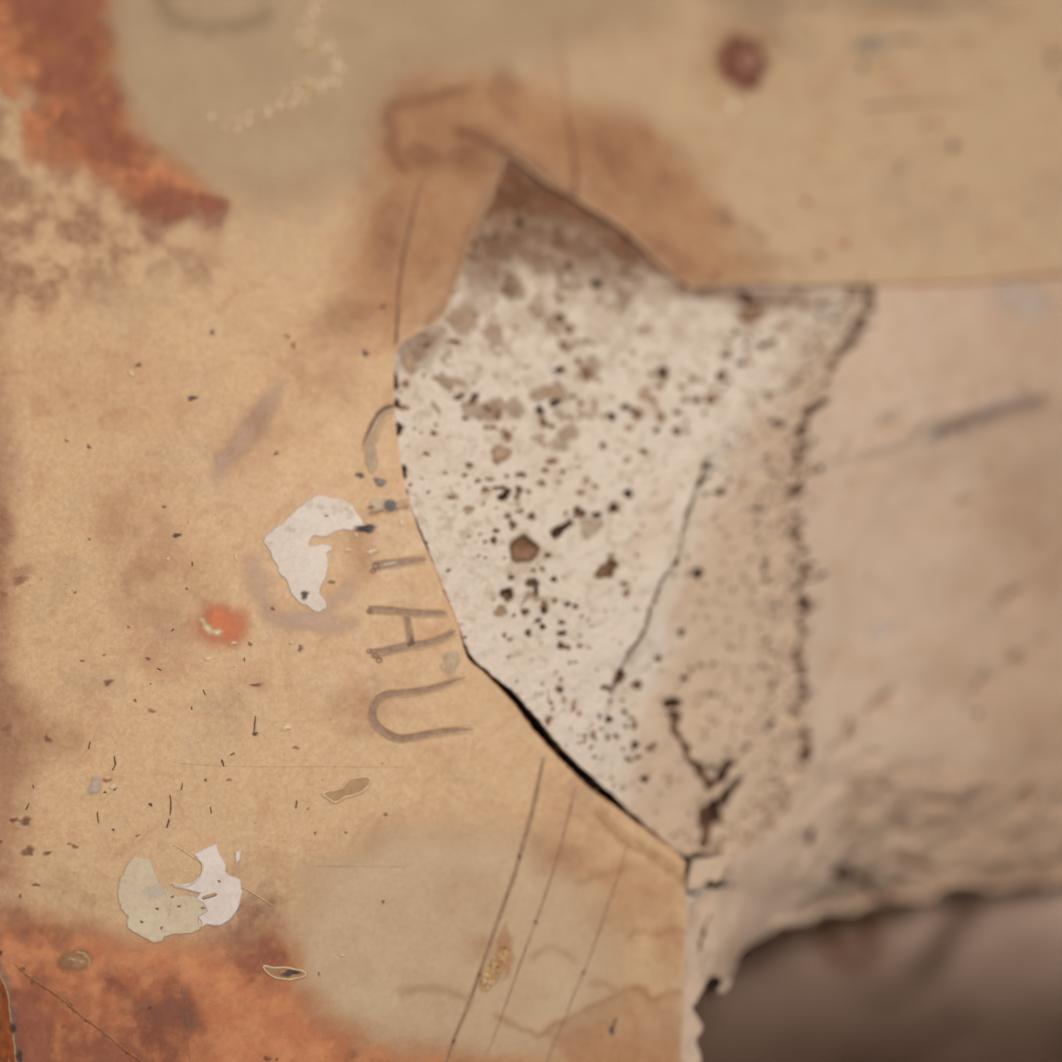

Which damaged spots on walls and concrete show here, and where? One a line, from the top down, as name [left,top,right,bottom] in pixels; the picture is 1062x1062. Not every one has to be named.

rust [0,0,225,225]
rust [720,37,769,92]
leakage [468,157,666,278]
peeling [264,495,363,612]
spalling [394,191,876,869]
crack [612,323,815,687]
peeling [118,844,242,943]